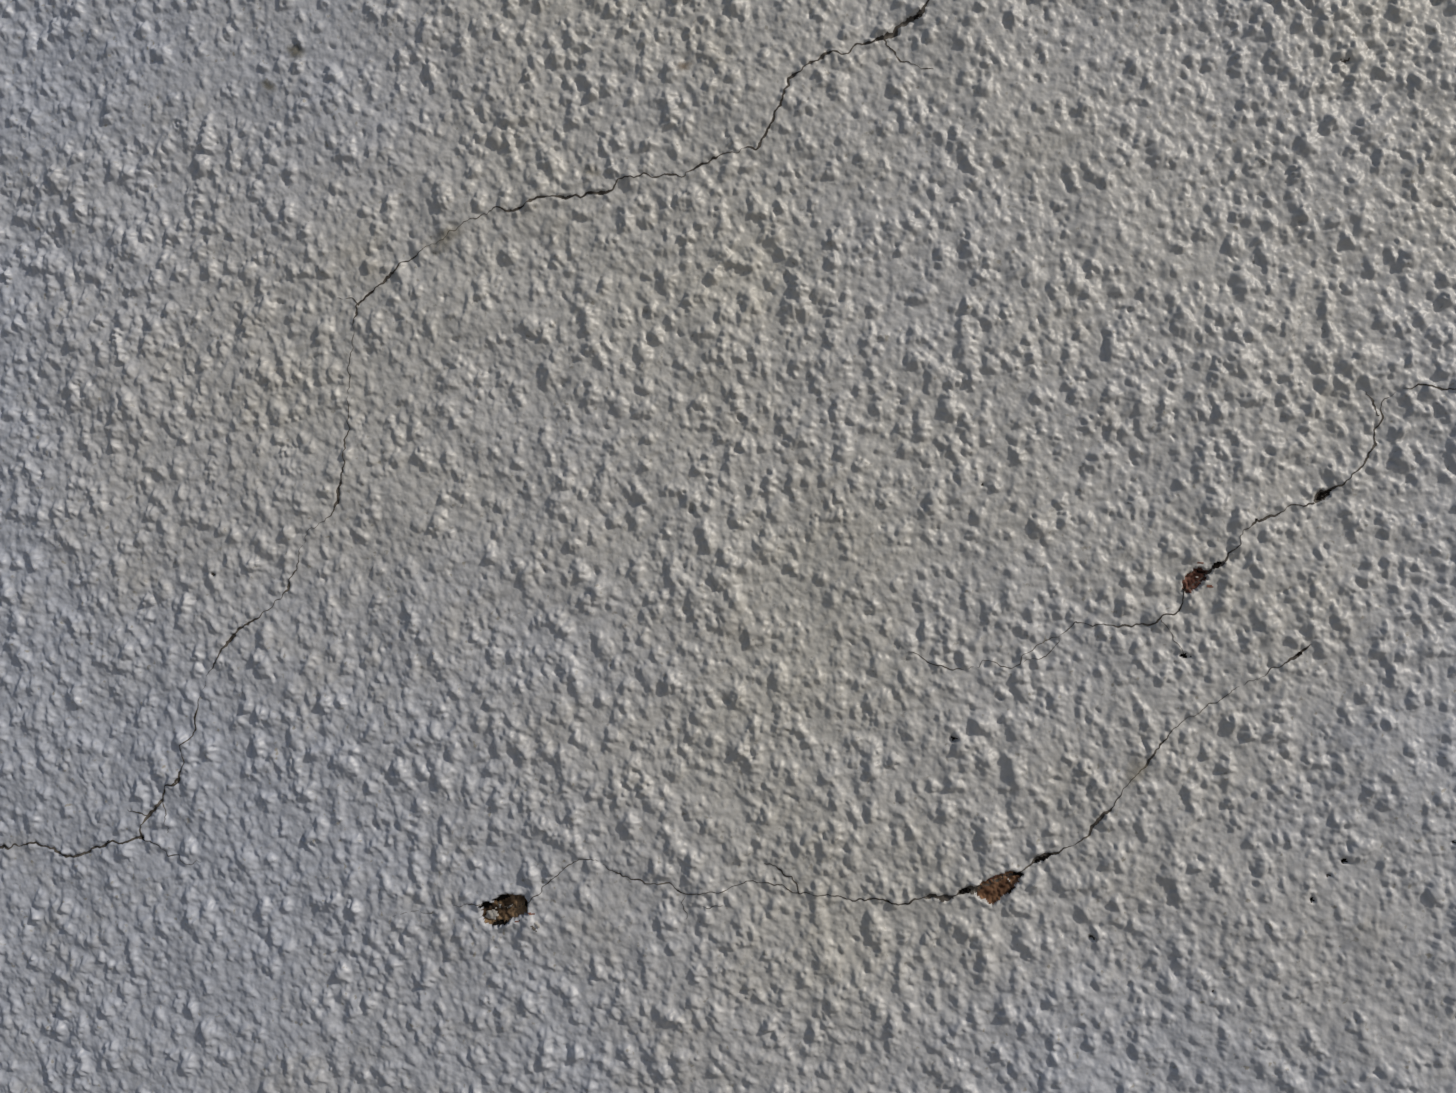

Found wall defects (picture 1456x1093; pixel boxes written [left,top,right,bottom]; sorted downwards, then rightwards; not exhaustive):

crack [0,0,933,865]
crack [913,383,1456,670]
peeling [1182,562,1213,593]
peeling [478,894,540,932]
crack [395,644,1311,919]
peeling [977,871,1024,905]